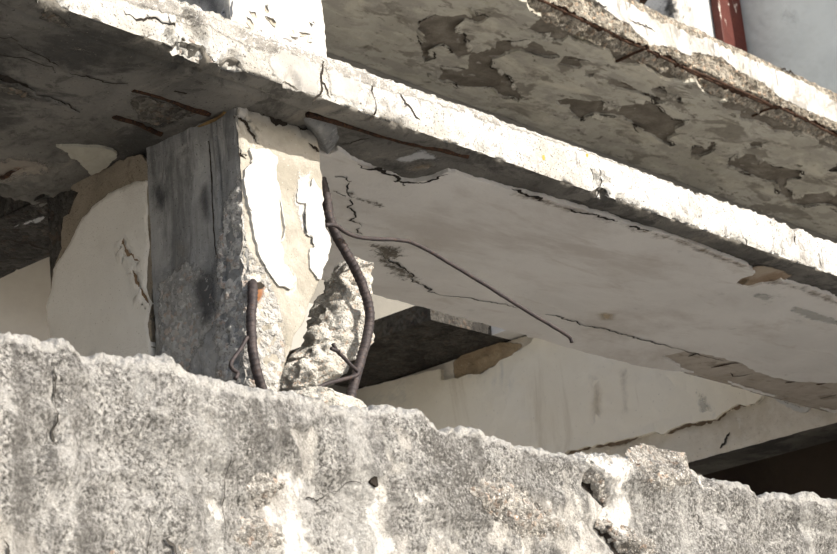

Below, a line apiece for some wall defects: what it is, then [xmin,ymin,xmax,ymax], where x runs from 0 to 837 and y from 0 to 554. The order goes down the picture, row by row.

crack [0,37,127,114]
crack [124,7,186,56]
peeling [267,18,361,104]
spalling [558,80,689,148]
spalling [641,39,837,130]
peeling [295,172,331,280]
crack [512,189,543,201]
crack [566,208,649,231]
peeling [157,148,295,392]
spalling [454,342,522,379]
spalling [665,351,837,412]
crack [568,401,759,465]